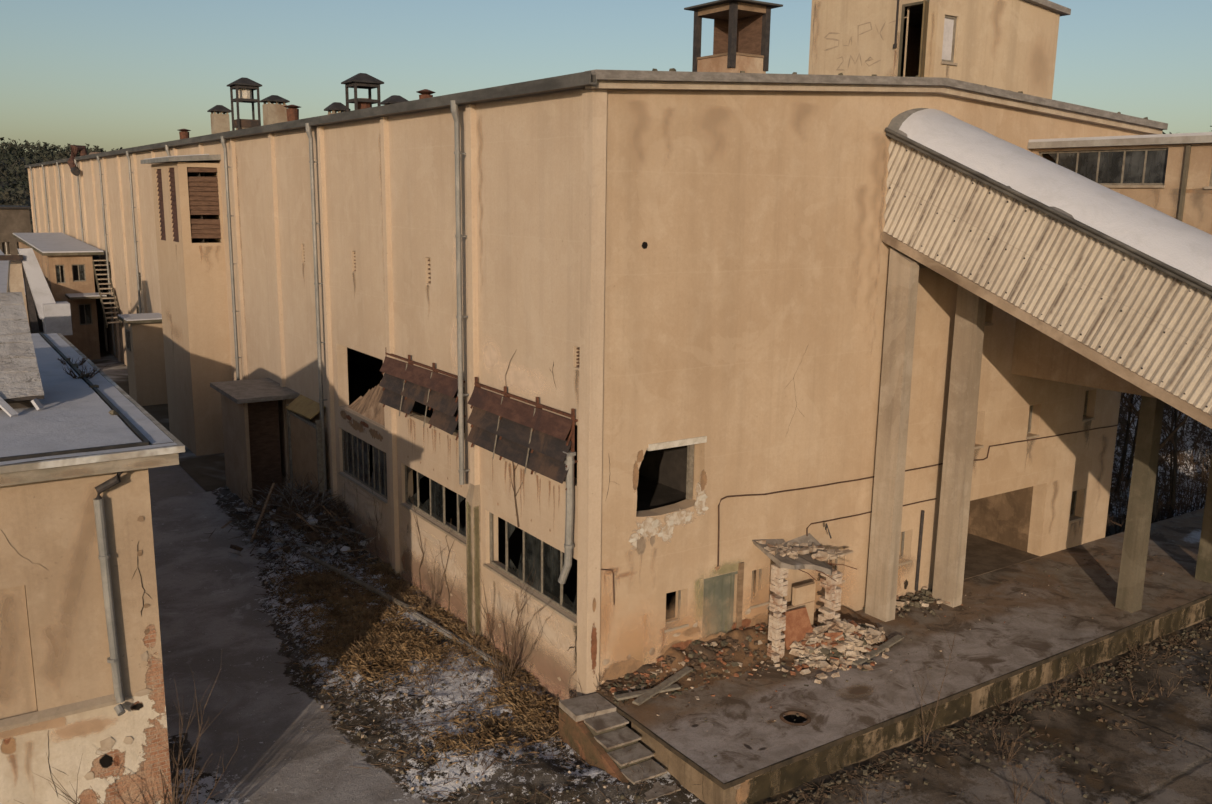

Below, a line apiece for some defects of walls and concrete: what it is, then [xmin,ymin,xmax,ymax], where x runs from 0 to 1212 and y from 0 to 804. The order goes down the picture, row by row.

spalling [340,411,383,442]
spalling [629,470,709,555]
crack [132,516,150,634]
flaking render [77,625,173,804]